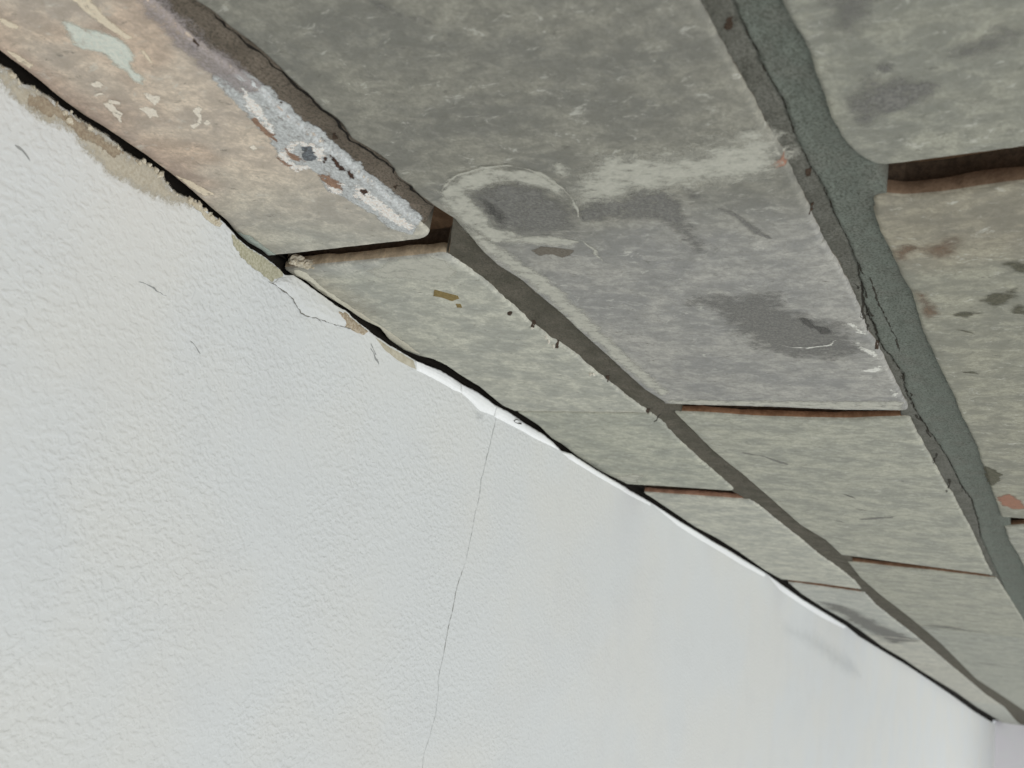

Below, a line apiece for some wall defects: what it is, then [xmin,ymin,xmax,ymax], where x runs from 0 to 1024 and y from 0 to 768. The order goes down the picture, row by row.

flaking render [0,50,222,227]
peeling [63,0,161,118]
damp [441,130,903,410]
crack [736,5,981,535]
peeling [232,235,846,628]